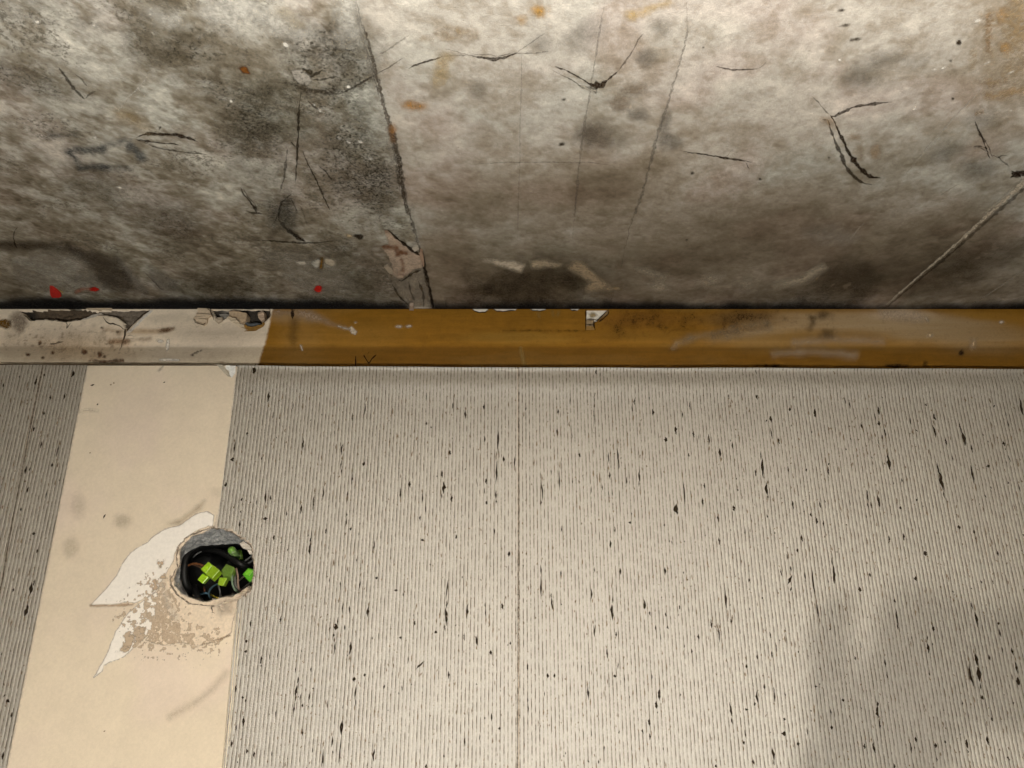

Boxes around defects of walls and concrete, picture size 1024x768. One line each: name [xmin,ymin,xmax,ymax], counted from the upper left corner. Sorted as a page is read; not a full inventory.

leakage [262,0,366,116]
crack [556,67,617,93]
crack [138,127,207,155]
crack [241,2,442,299]
leakage [324,125,391,217]
crack [828,102,888,185]
flaking render [22,308,152,349]
leakage [0,243,408,331]
flaking render [193,308,271,331]
spalling [381,230,434,311]
leakage [432,260,1024,323]
flaking render [90,512,237,677]